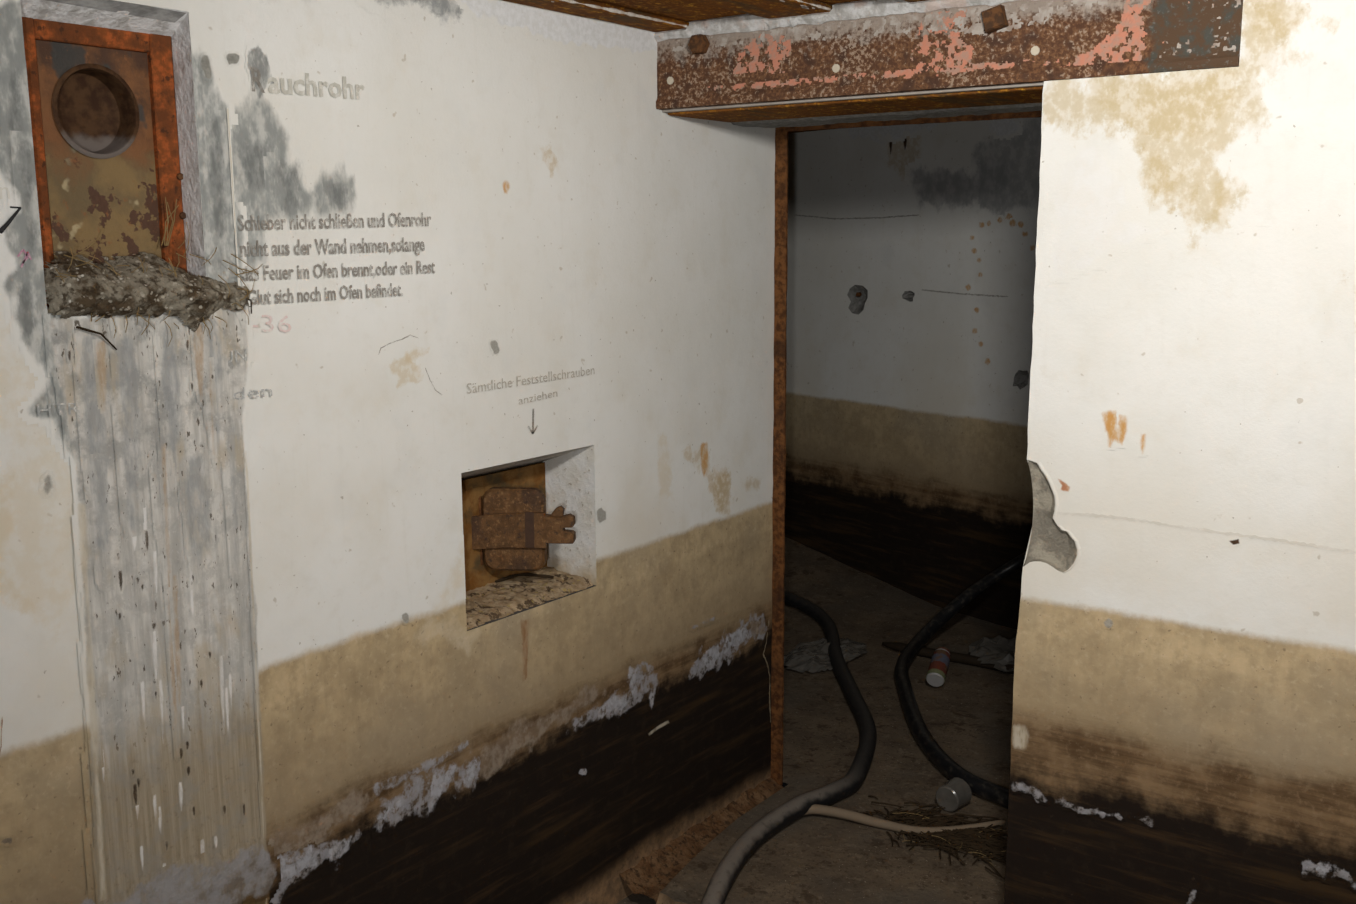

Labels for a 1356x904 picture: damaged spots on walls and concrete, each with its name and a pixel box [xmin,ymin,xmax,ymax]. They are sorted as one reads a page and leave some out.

water stain [840,0,1341,265]
water stain [0,0,773,904]
spalling [1023,460,1081,573]
water stain [785,384,1356,904]
corrosion [1097,407,1149,457]